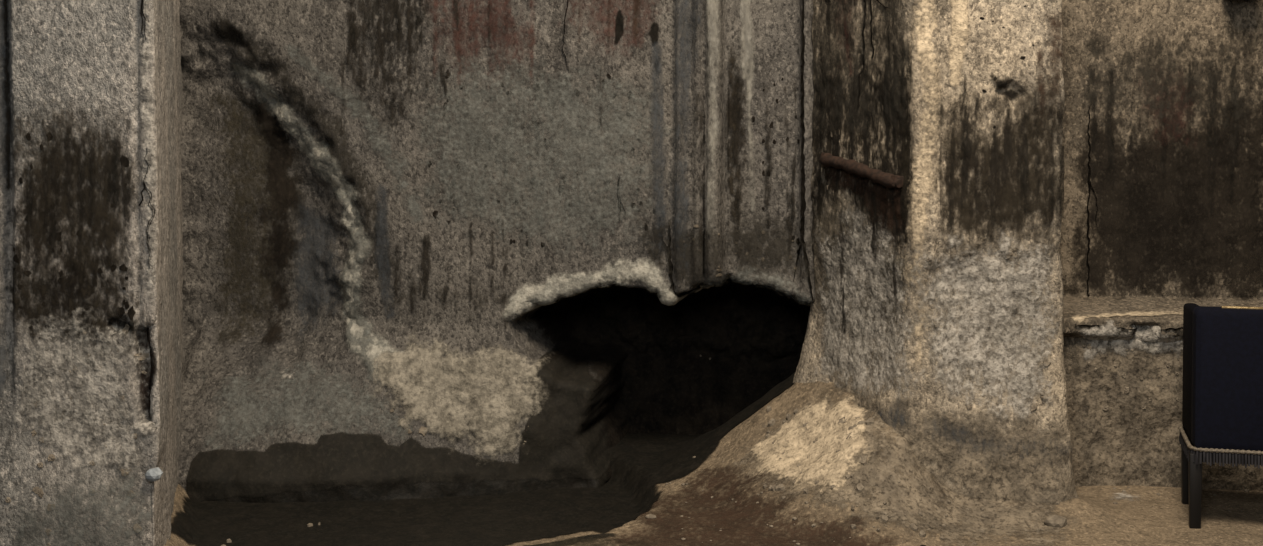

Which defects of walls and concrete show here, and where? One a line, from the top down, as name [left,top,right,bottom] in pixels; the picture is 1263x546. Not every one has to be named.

water stain [0,0,158,355]
water stain [211,0,518,380]
spalling [504,211,911,494]
water stain [653,0,1065,337]
spalling [917,237,1058,417]
peeling [1070,322,1183,487]
water stain [1073,311,1182,323]
water stain [1087,31,1263,215]